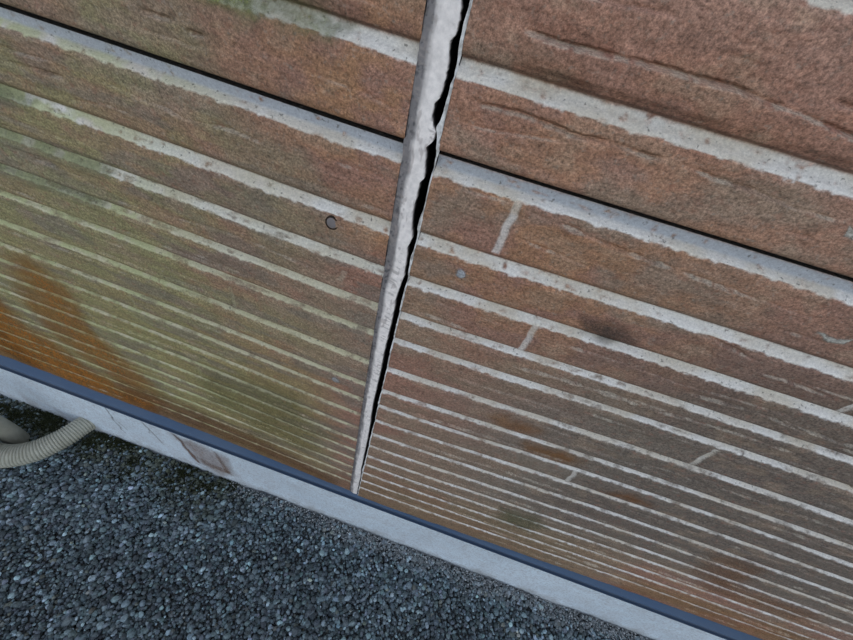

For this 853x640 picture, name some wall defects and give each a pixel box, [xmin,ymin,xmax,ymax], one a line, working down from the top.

corrosion [0,264,163,408]
crack [358,0,473,494]